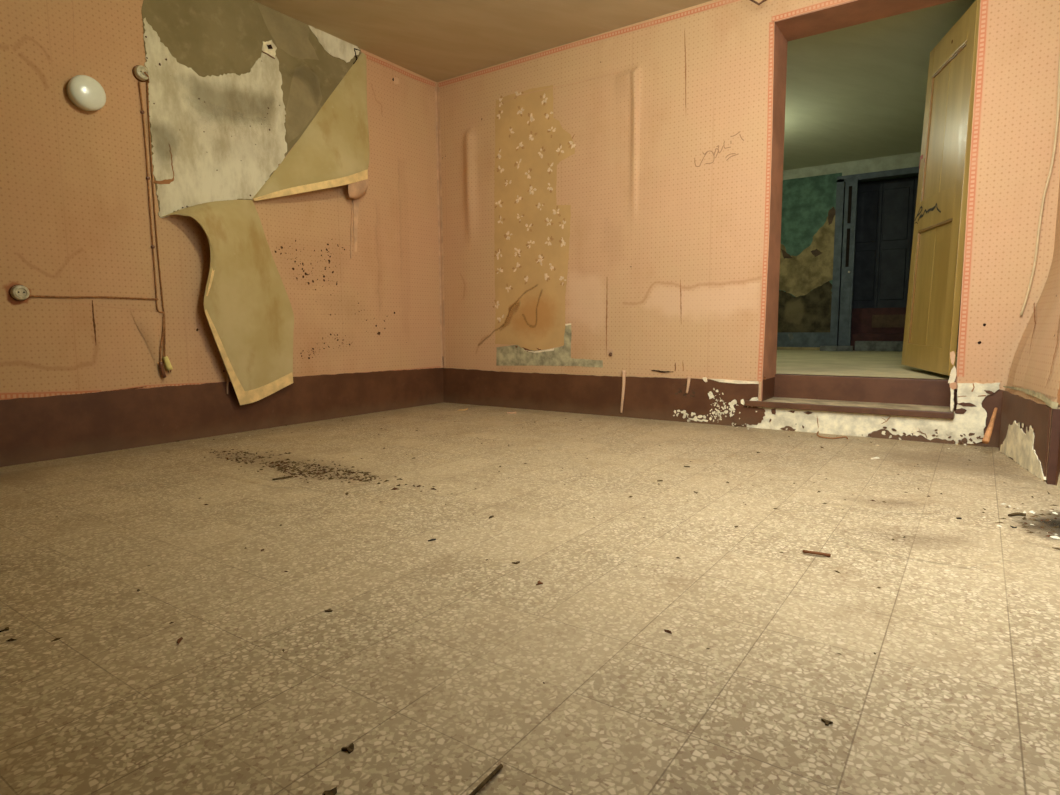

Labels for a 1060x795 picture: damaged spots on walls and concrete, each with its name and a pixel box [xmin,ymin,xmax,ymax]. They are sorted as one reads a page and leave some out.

flaking render [141,0,361,218]
flaking render [496,323,613,368]
peeling [673,379,813,431]
peeling [866,383,1060,489]